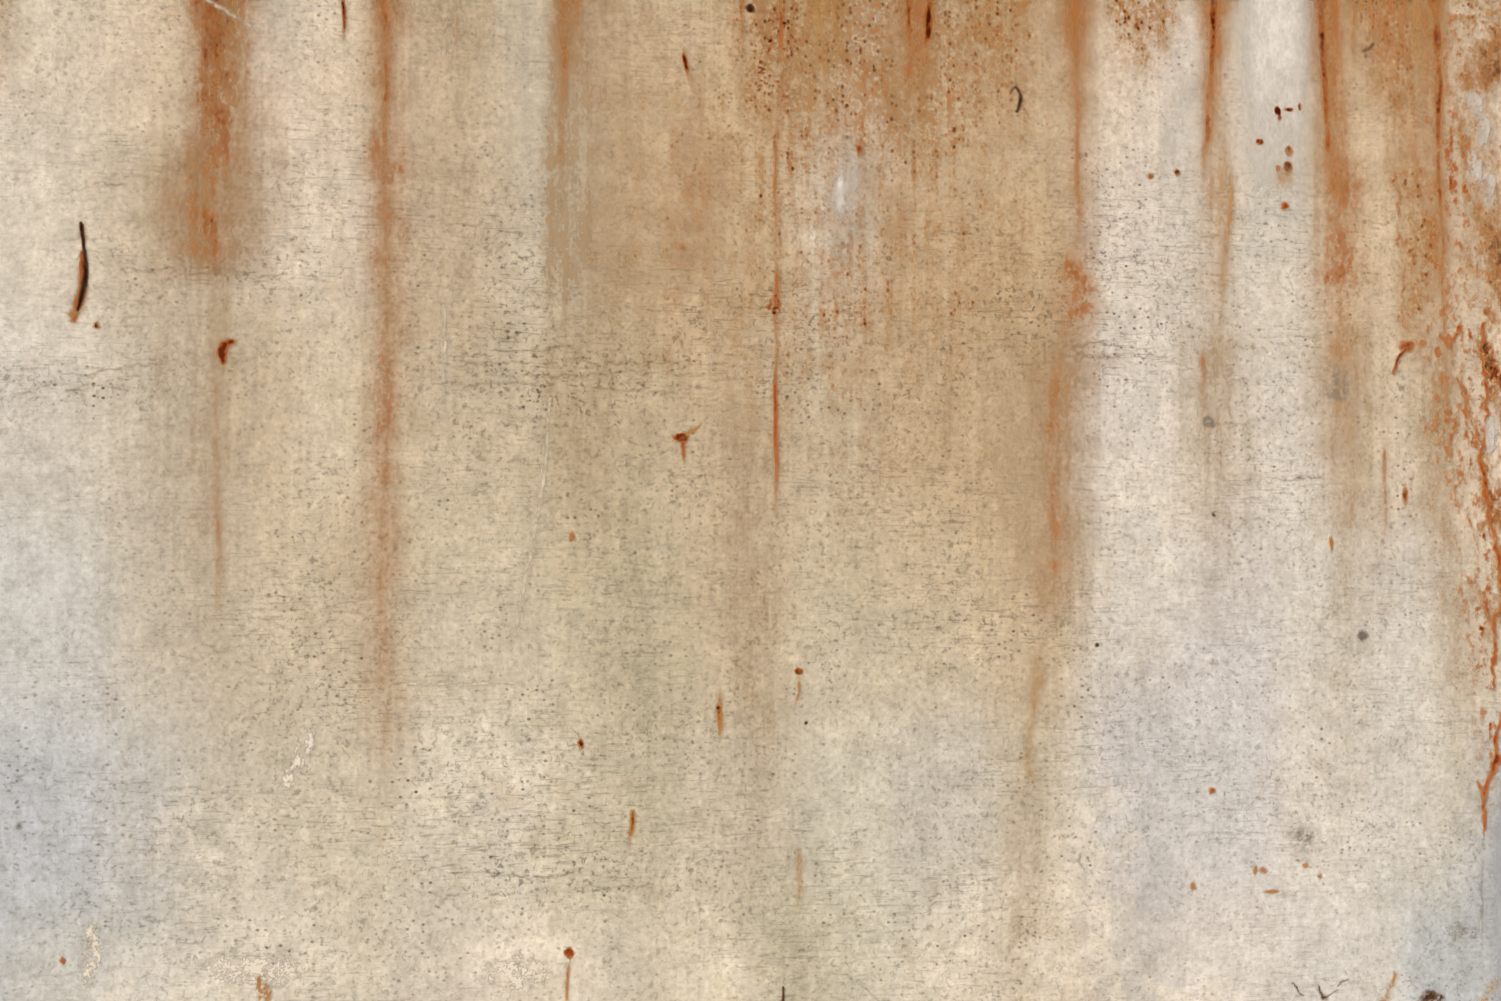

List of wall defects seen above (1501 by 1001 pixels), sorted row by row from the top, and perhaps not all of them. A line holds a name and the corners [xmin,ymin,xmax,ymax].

rust [1107,0,1181,64]
rust [179,0,259,265]
rust [1201,0,1233,238]
rust [1276,146,1293,180]
rust [1274,104,1301,120]
rust [1310,0,1448,374]
rust [369,0,404,484]
rust [670,0,1035,495]
rust [1062,256,1093,320]
rust [217,339,235,365]
rust [1383,450,1408,515]
rust [1420,991,1444,1001]